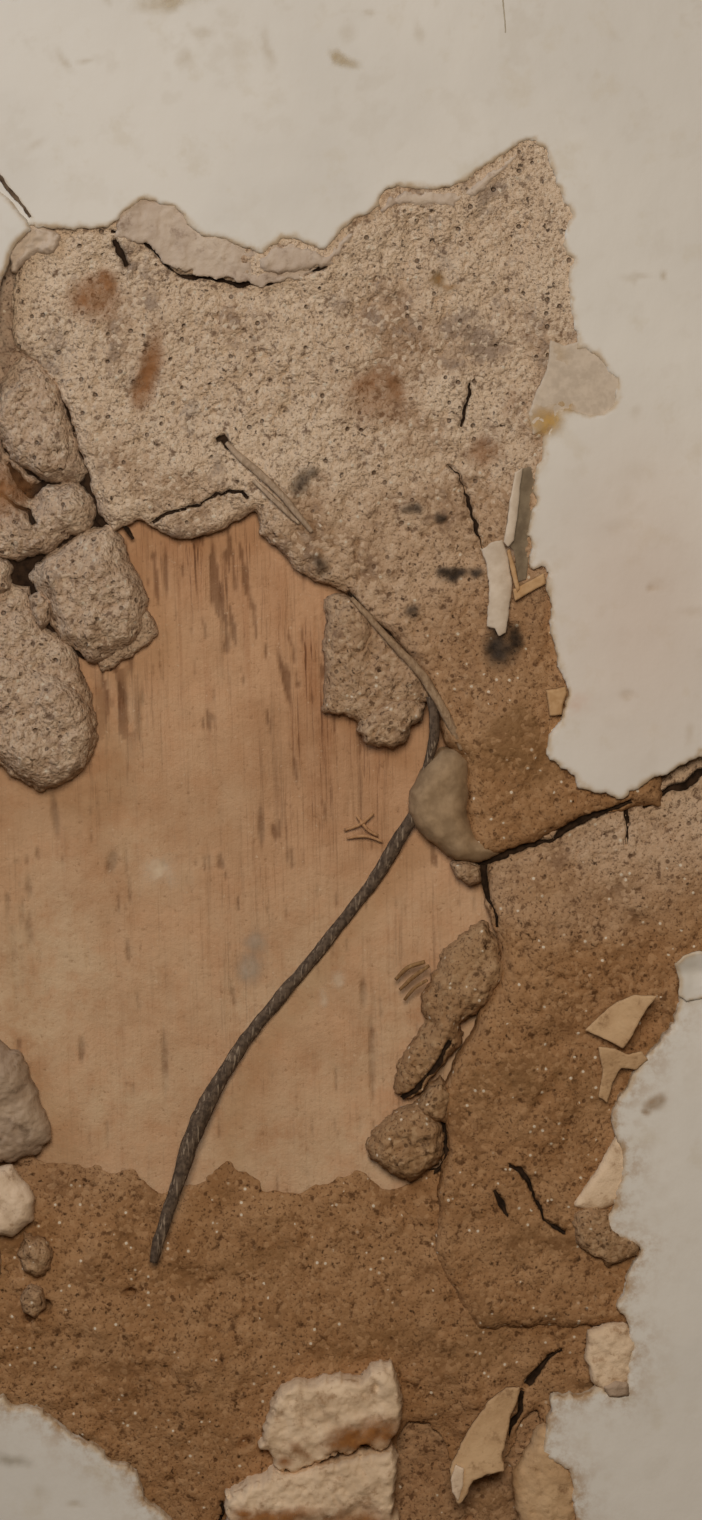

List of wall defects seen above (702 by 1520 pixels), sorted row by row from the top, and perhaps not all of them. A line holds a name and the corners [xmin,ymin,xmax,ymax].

crack [0,175,31,218]
crack [111,230,274,288]
crack [460,383,471,427]
crack [3,448,47,525]
crack [64,403,249,540]
flaking render [0,140,702,853]
crack [449,466,482,548]
crack [476,768,702,927]
flaking render [0,776,702,1520]
crack [494,1164,566,1234]